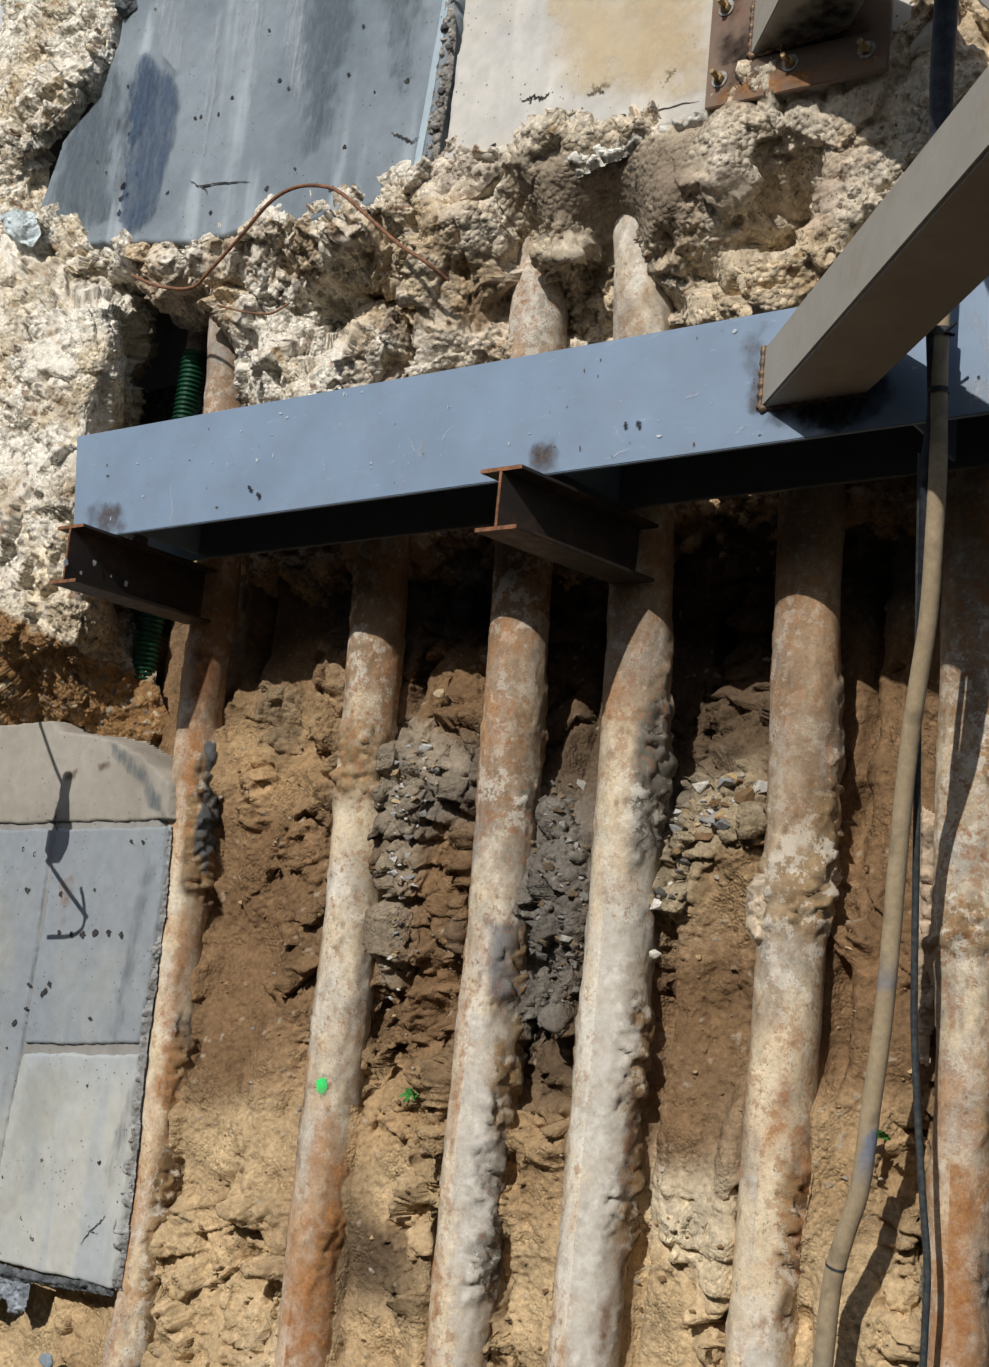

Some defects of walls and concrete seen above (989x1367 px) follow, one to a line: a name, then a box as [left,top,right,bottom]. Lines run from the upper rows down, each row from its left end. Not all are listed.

leakage [54,2,181,231]
spalling [953,0,989,110]
spalling [0,0,934,749]
rust [285,1164,349,1367]